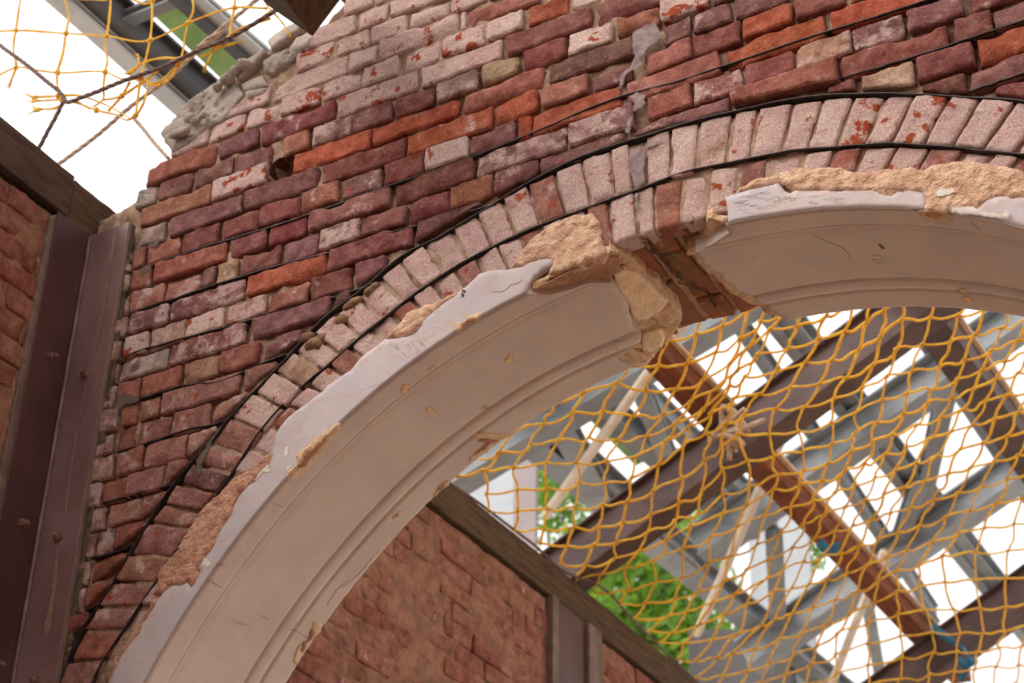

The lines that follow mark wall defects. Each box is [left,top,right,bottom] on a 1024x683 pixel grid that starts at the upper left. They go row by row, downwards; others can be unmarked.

spalling [269,156,295,182]
spalling [732,161,1024,222]
spalling [511,213,610,277]
spalling [386,291,459,339]
spalling [453,312,482,332]
spalling [286,422,341,479]
spalling [108,451,273,681]
spalling [293,620,321,664]